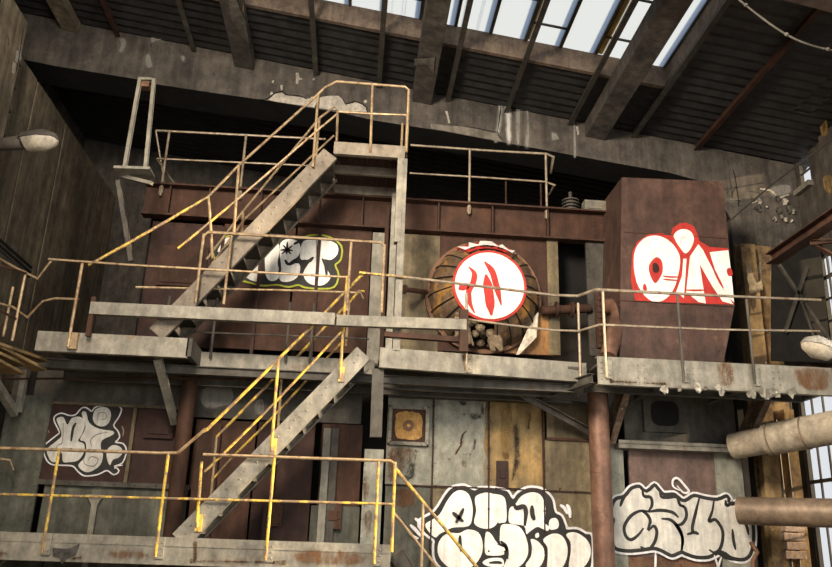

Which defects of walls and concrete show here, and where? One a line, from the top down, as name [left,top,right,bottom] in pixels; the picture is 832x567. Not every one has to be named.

spalling [260,80,368,112]
rust [796,369,828,390]